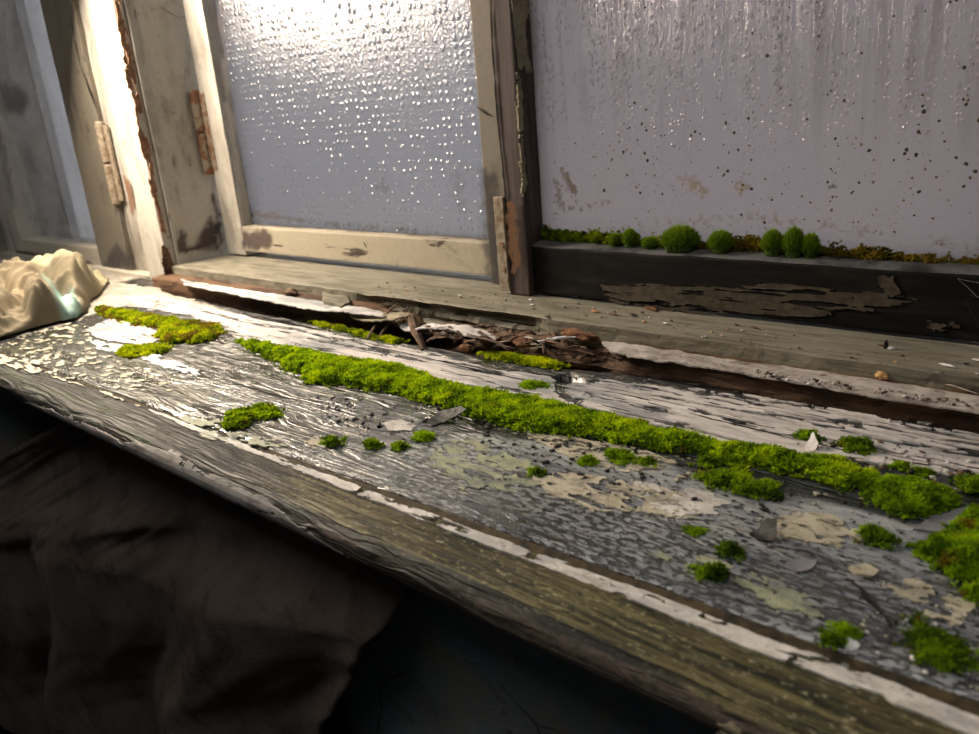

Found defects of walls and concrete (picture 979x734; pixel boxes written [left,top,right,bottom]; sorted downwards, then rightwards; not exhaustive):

corrosion [124,176,135,216]
leakage [546,79,799,232]
leakage [818,90,961,233]
peeling [180,279,496,340]
peeling [591,275,918,329]
peeling [0,295,979,734]